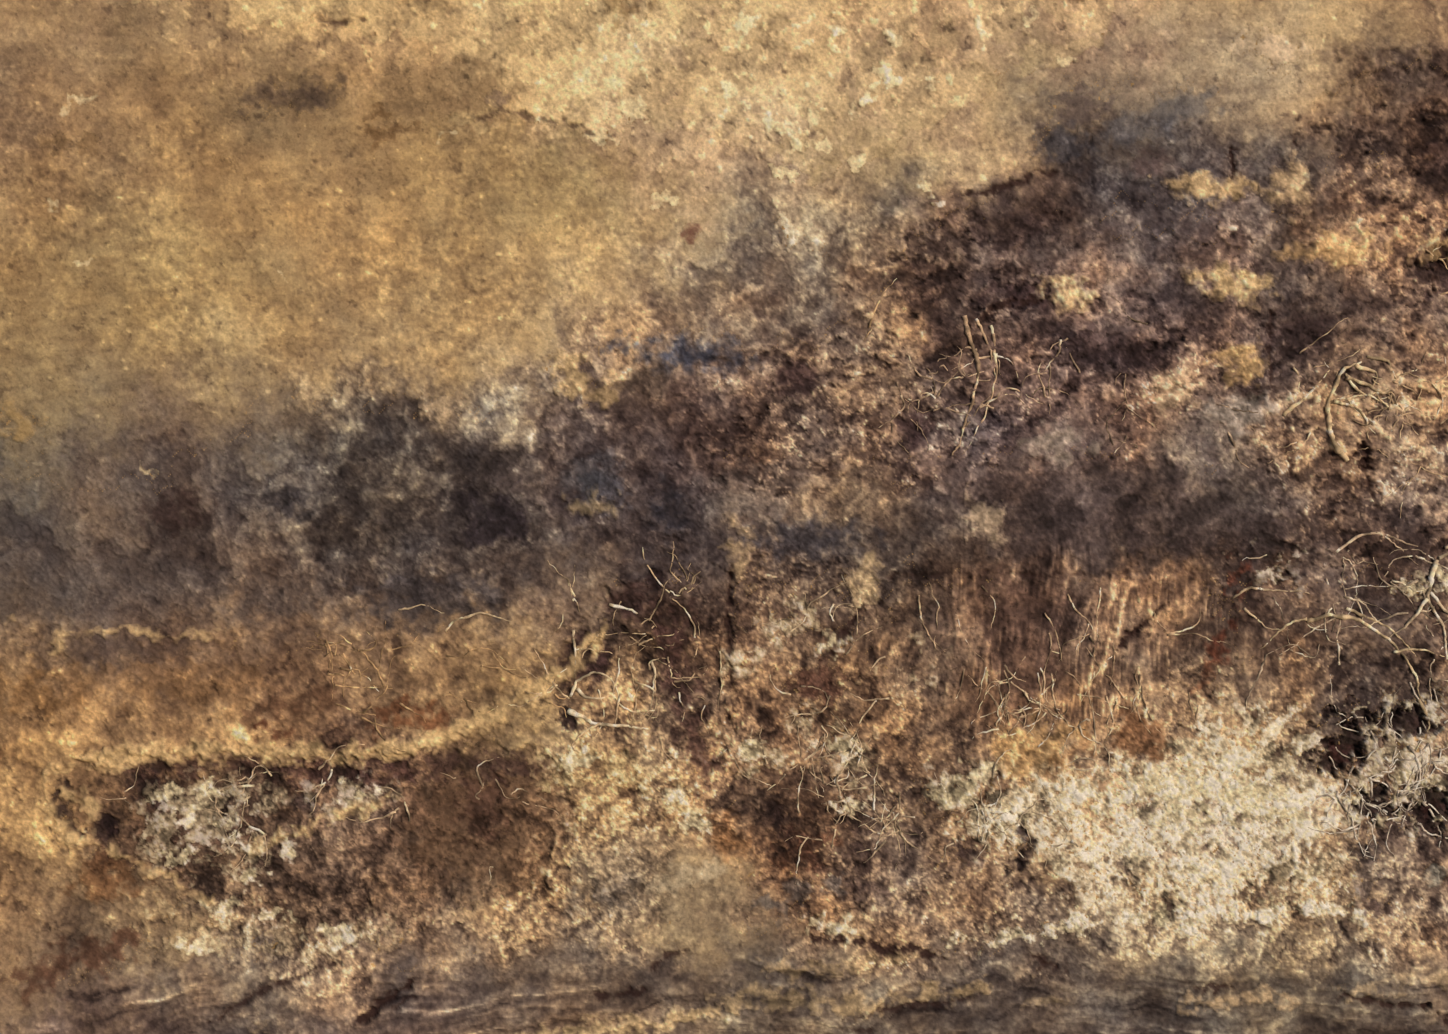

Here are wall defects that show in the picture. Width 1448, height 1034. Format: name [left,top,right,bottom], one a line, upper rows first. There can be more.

leakage [37,128,100,160]
leakage [234,68,348,124]
leakage [362,54,529,151]
leakage [676,221,703,245]
leakage [974,64,1345,248]
leakage [0,322,1340,708]
leakage [1376,563,1448,610]
leakage [114,763,413,985]
leakage [520,712,923,955]
leakage [720,681,1448,961]